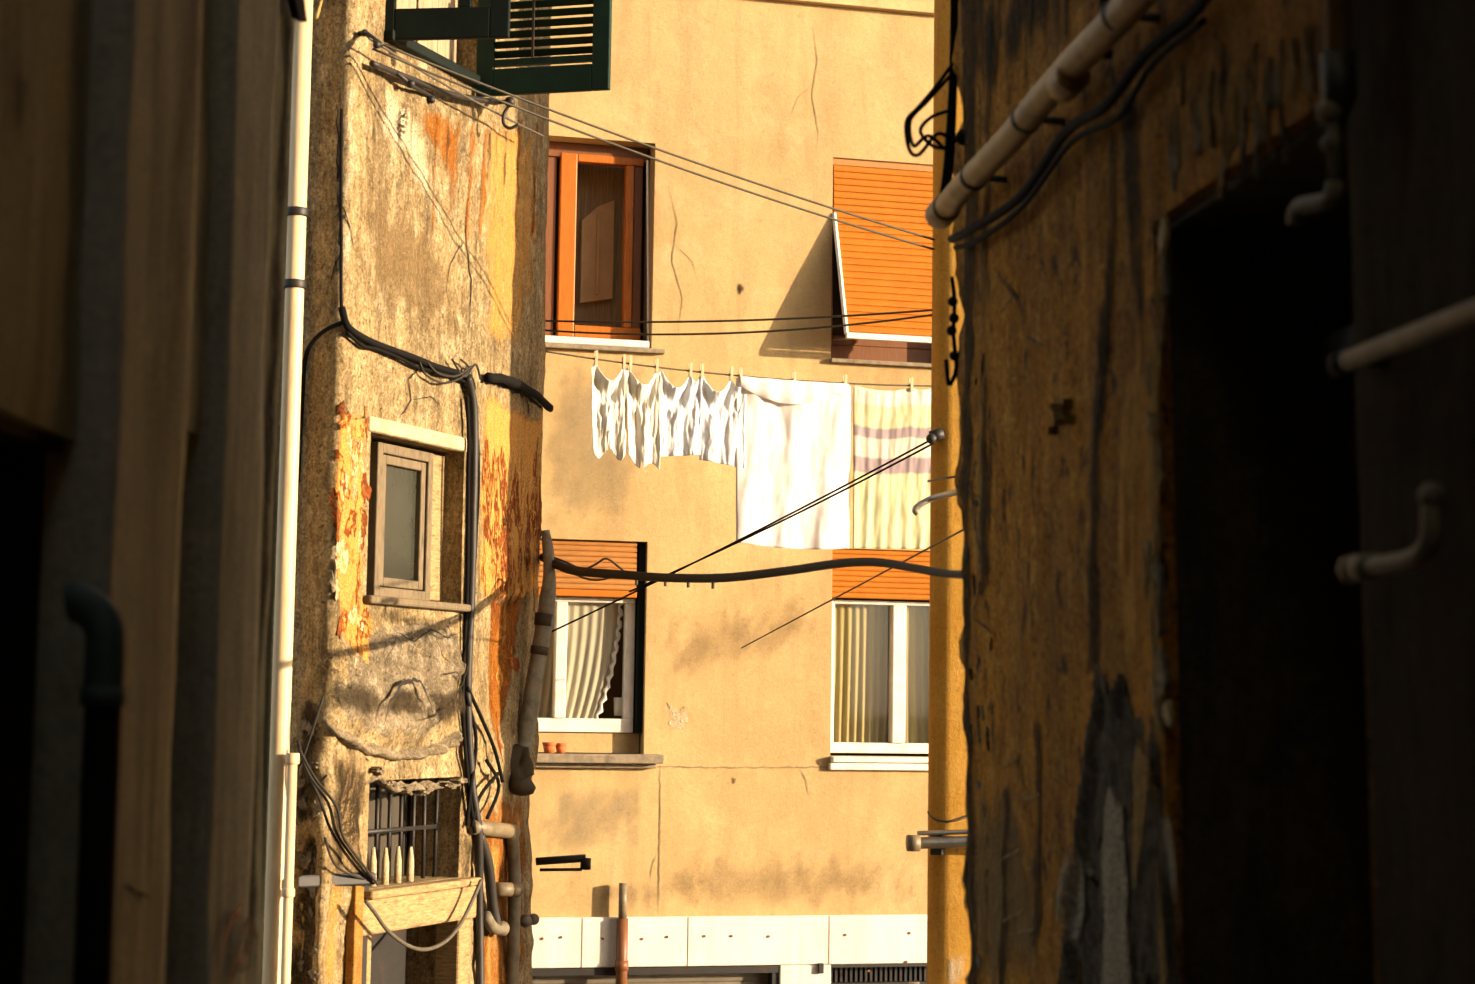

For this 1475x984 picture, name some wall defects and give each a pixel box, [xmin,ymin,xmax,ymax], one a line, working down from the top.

damp [961,0,1066,165]
rust [412,113,538,343]
crack [669,189,697,329]
damp [1087,97,1146,671]
peeling [327,400,373,666]
peeling [480,395,542,762]
damp [958,182,1040,984]
spalling [1056,215,1180,984]
spalling [365,766,468,796]